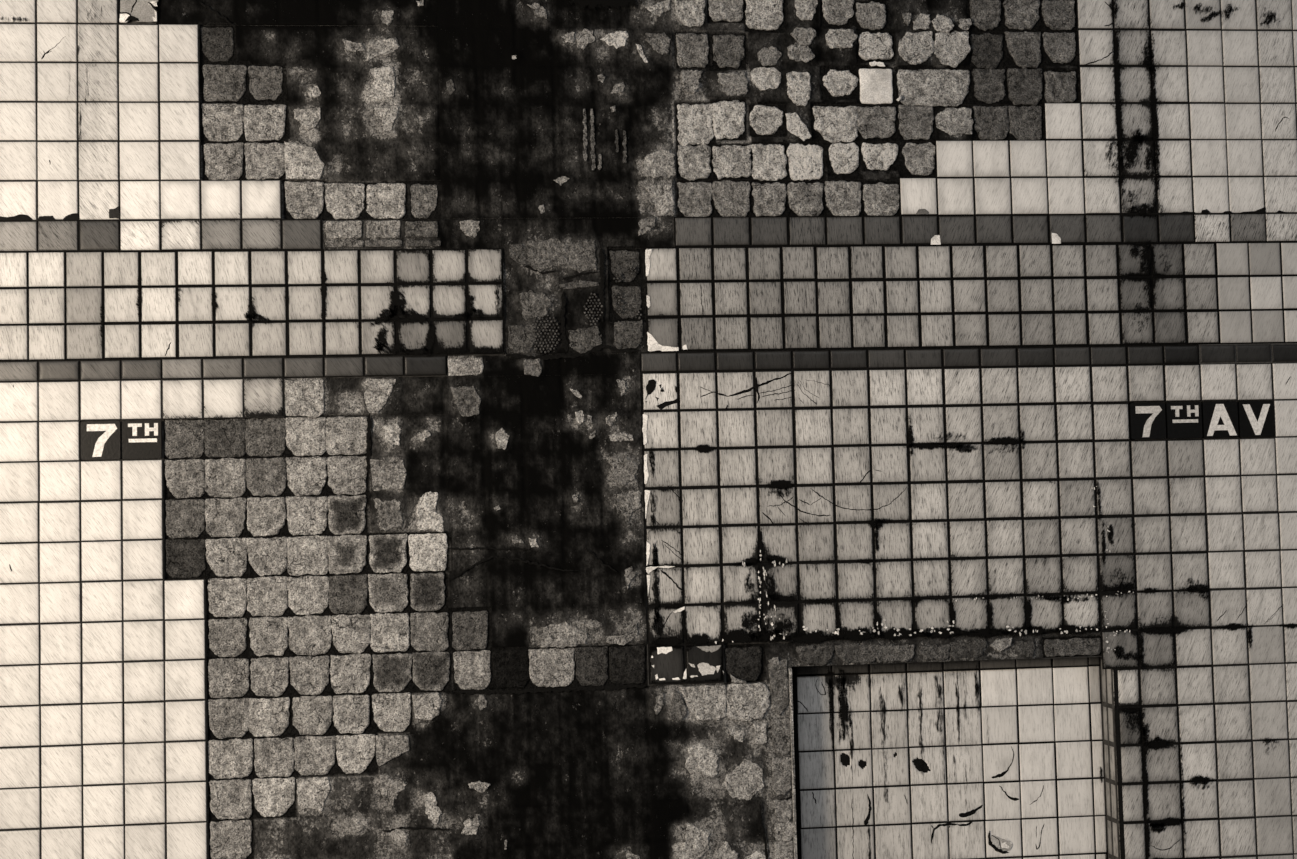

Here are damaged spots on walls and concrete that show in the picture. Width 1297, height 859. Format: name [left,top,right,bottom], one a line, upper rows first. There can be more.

leakage [1104,0,1160,215]
leakage [1134,280,1156,331]
spalling [119,0,1134,859]
leakage [156,0,1101,802]
crack [701,373,830,410]
leakage [1113,619,1193,669]
leakage [255,685,792,859]
leakage [1122,708,1165,859]
leakage [1178,719,1209,850]